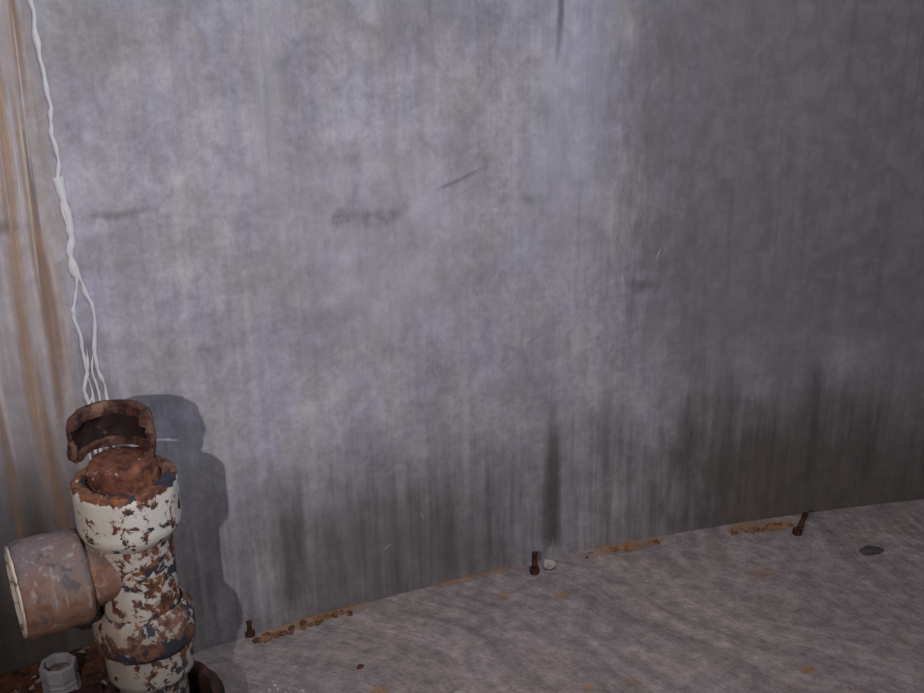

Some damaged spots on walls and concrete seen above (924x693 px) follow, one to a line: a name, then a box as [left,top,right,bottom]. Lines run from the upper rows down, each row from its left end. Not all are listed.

rust [0,0,75,433]
crack [27,0,110,405]
water stain [698,422,924,529]